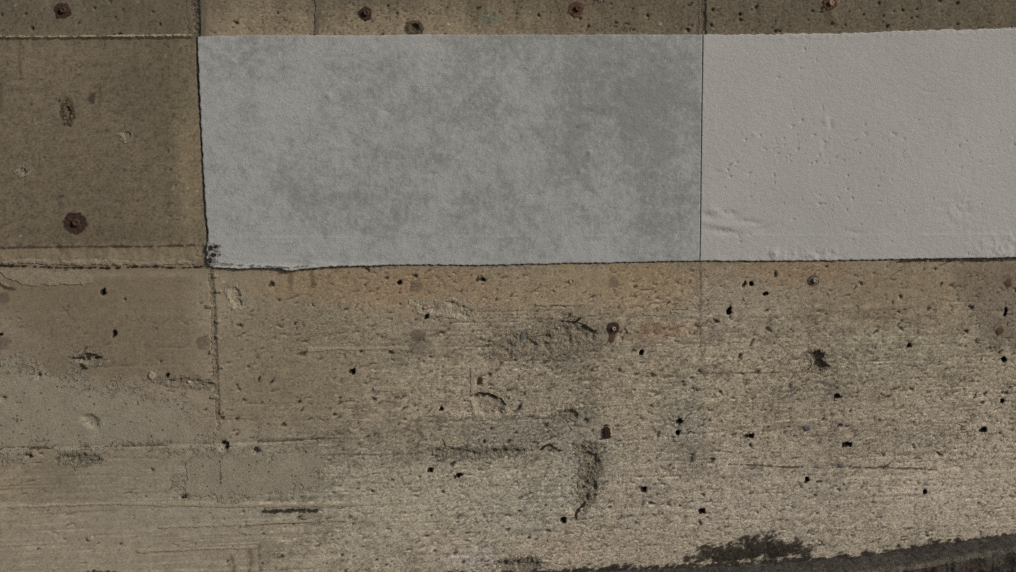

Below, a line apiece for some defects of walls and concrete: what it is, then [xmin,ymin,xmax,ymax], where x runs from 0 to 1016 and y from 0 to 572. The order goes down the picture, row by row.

rust [608,322,620,342]
damp [533,530,1016,572]